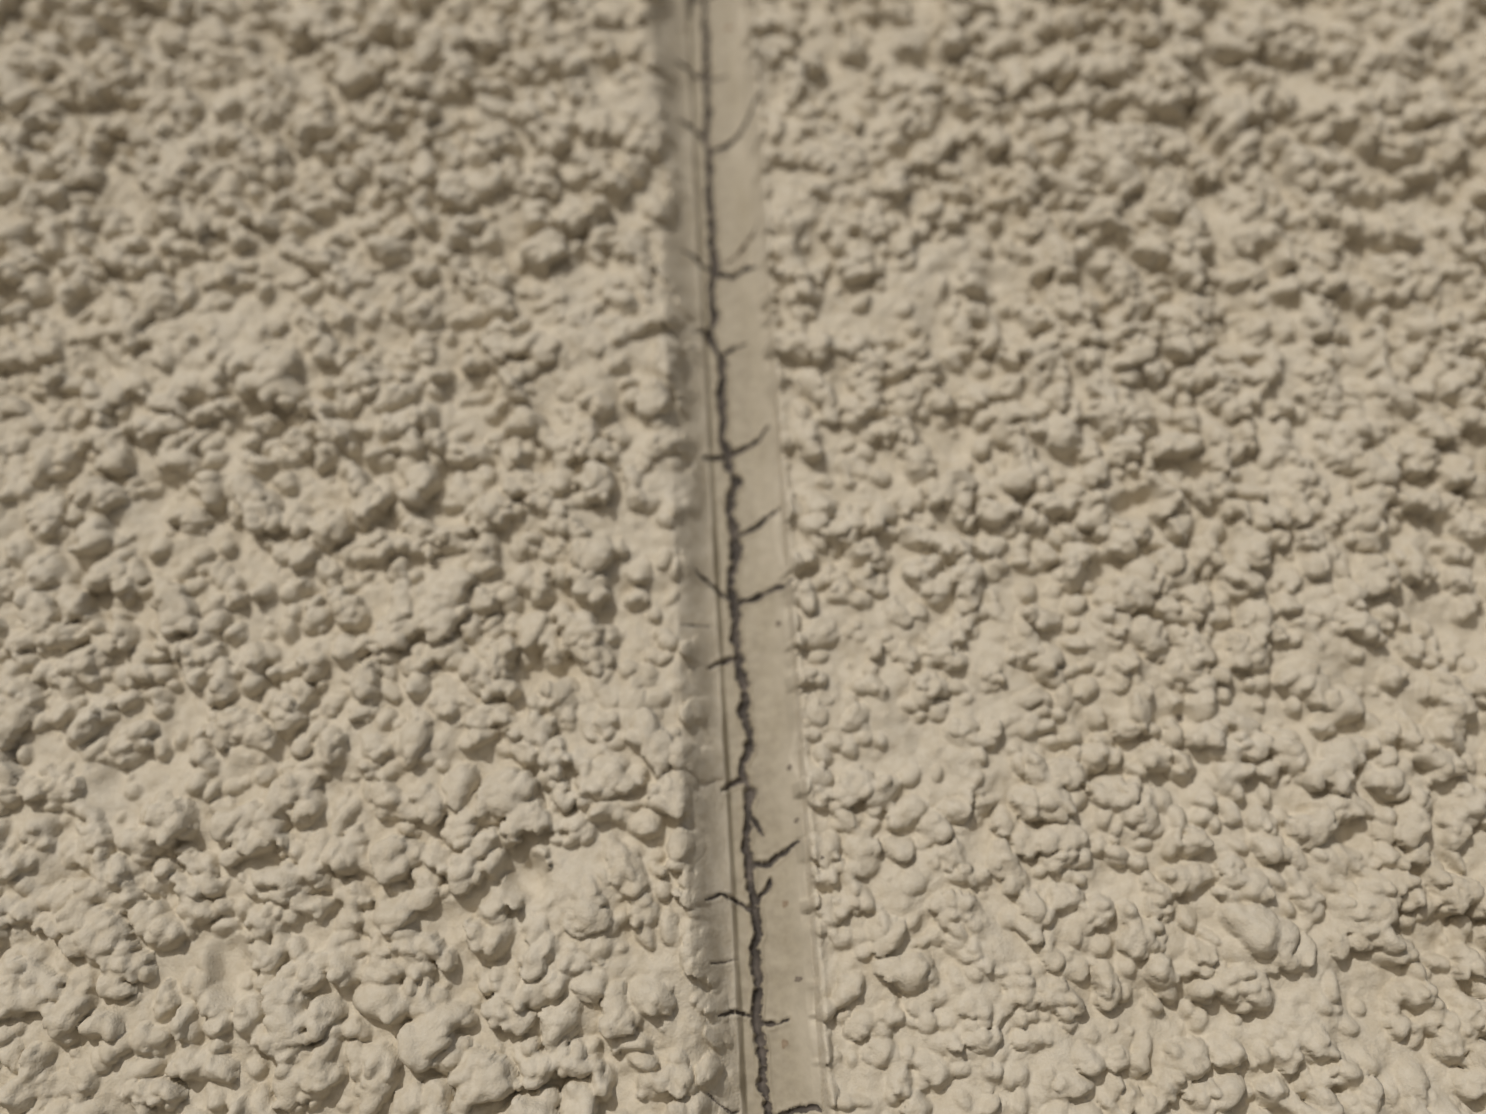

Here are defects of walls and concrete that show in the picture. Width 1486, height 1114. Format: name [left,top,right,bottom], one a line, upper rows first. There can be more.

crack [662,0,824,1114]